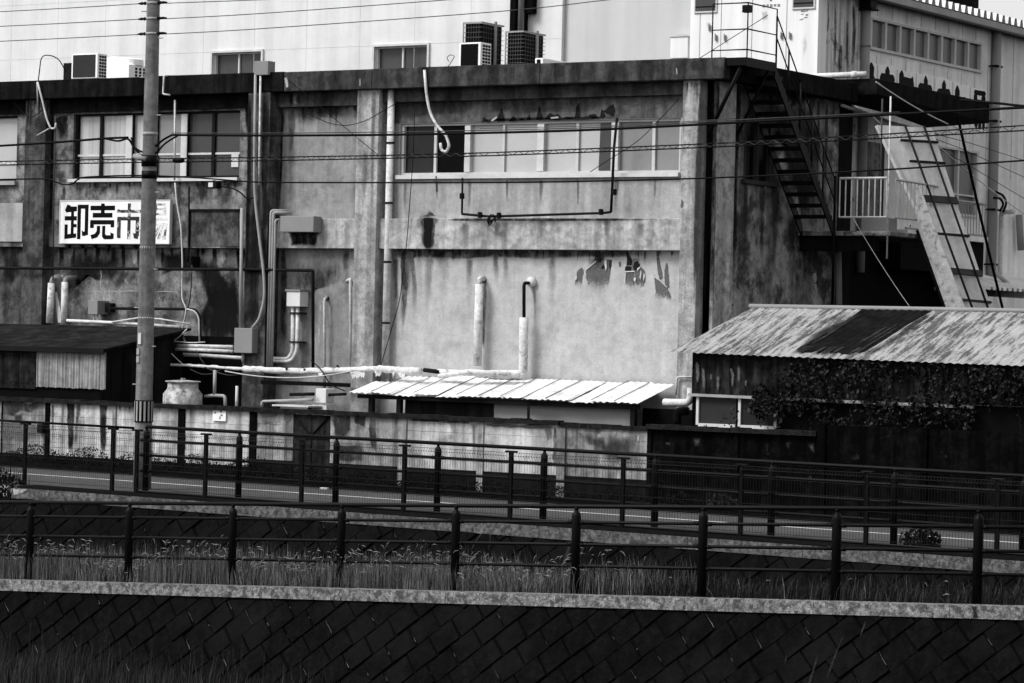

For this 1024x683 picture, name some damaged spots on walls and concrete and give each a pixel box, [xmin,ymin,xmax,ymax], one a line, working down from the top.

peeling [482,99,615,123]
water stain [161,77,375,348]
water stain [59,248,140,304]
water stain [393,211,673,314]
flaking render [575,251,671,299]
water stain [52,404,80,449]
water stain [100,405,130,449]